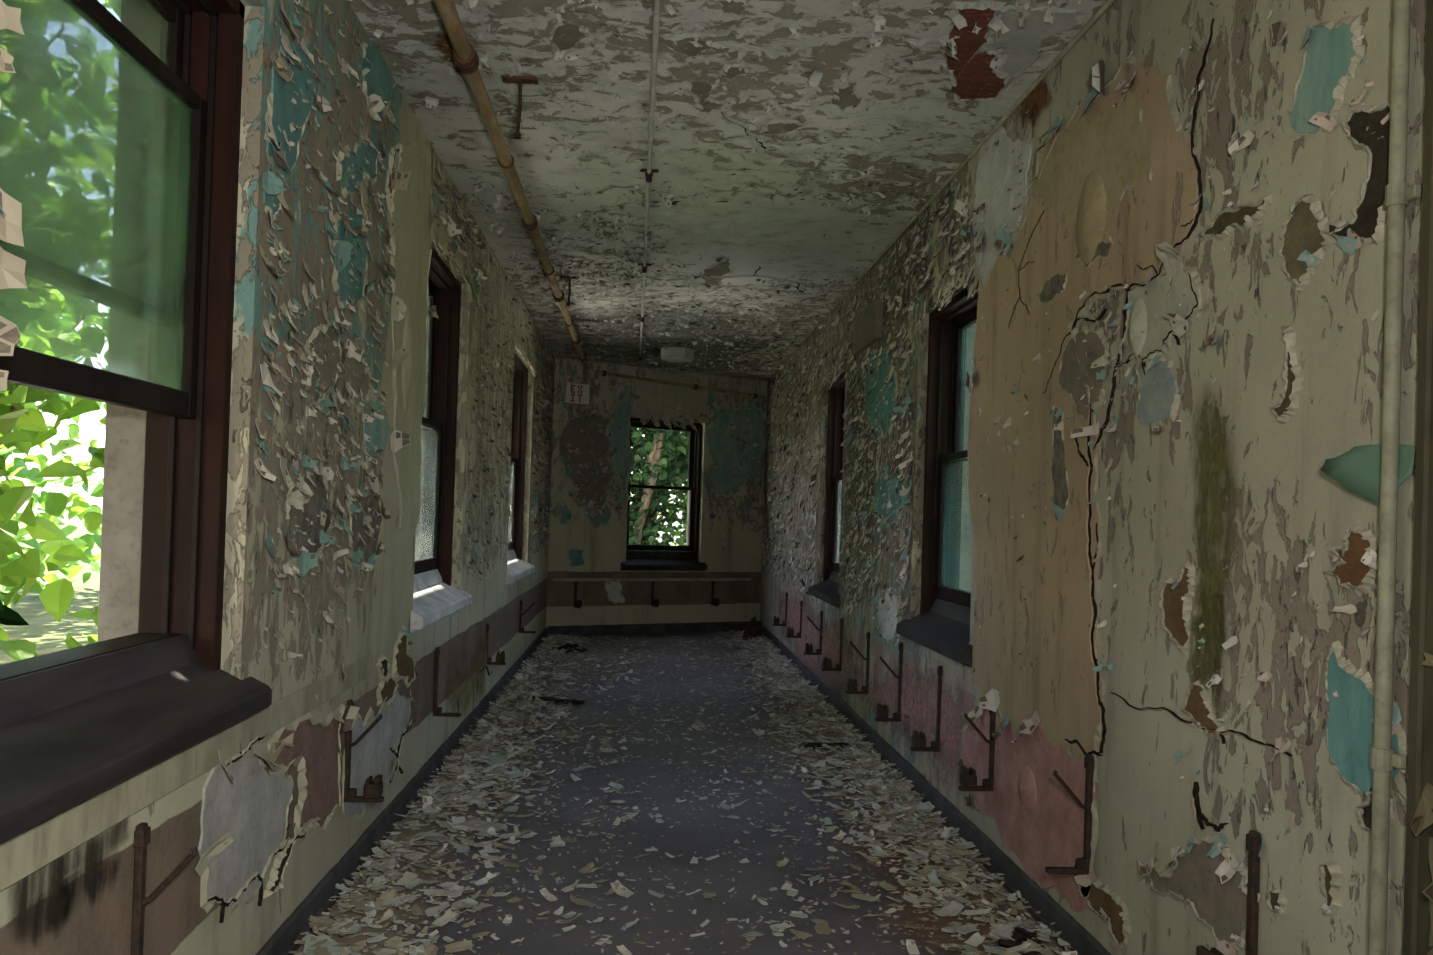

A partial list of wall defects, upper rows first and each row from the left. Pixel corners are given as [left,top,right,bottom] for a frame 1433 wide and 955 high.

peeling [1253,10,1390,293]
crack [1008,210,1044,329]
peeling [251,0,1288,955]
crack [1044,18,1293,758]
flaking render [1270,325,1304,424]
peeling [1320,444,1381,504]
flaking render [1291,525,1379,614]
peeling [195,626,419,921]
peeling [1302,640,1375,832]
peeling [1391,701,1408,778]
flaking render [1319,862,1343,918]
peeling [1390,782,1433,955]